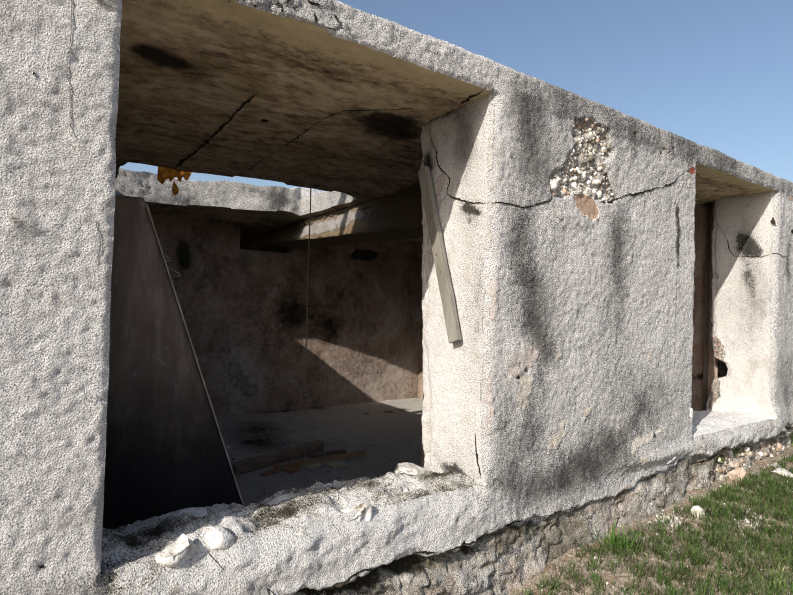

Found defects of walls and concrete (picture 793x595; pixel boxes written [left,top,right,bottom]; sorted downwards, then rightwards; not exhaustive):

crack [66,0,74,84]
crack [175,94,256,168]
damp [357,109,421,140]
crack [431,139,555,209]
spalling [549,118,614,221]
damp [734,231,763,297]
crack [714,211,786,258]
spalling [712,336,726,362]
flaking render [516,375,533,412]
spalling [708,377,721,409]